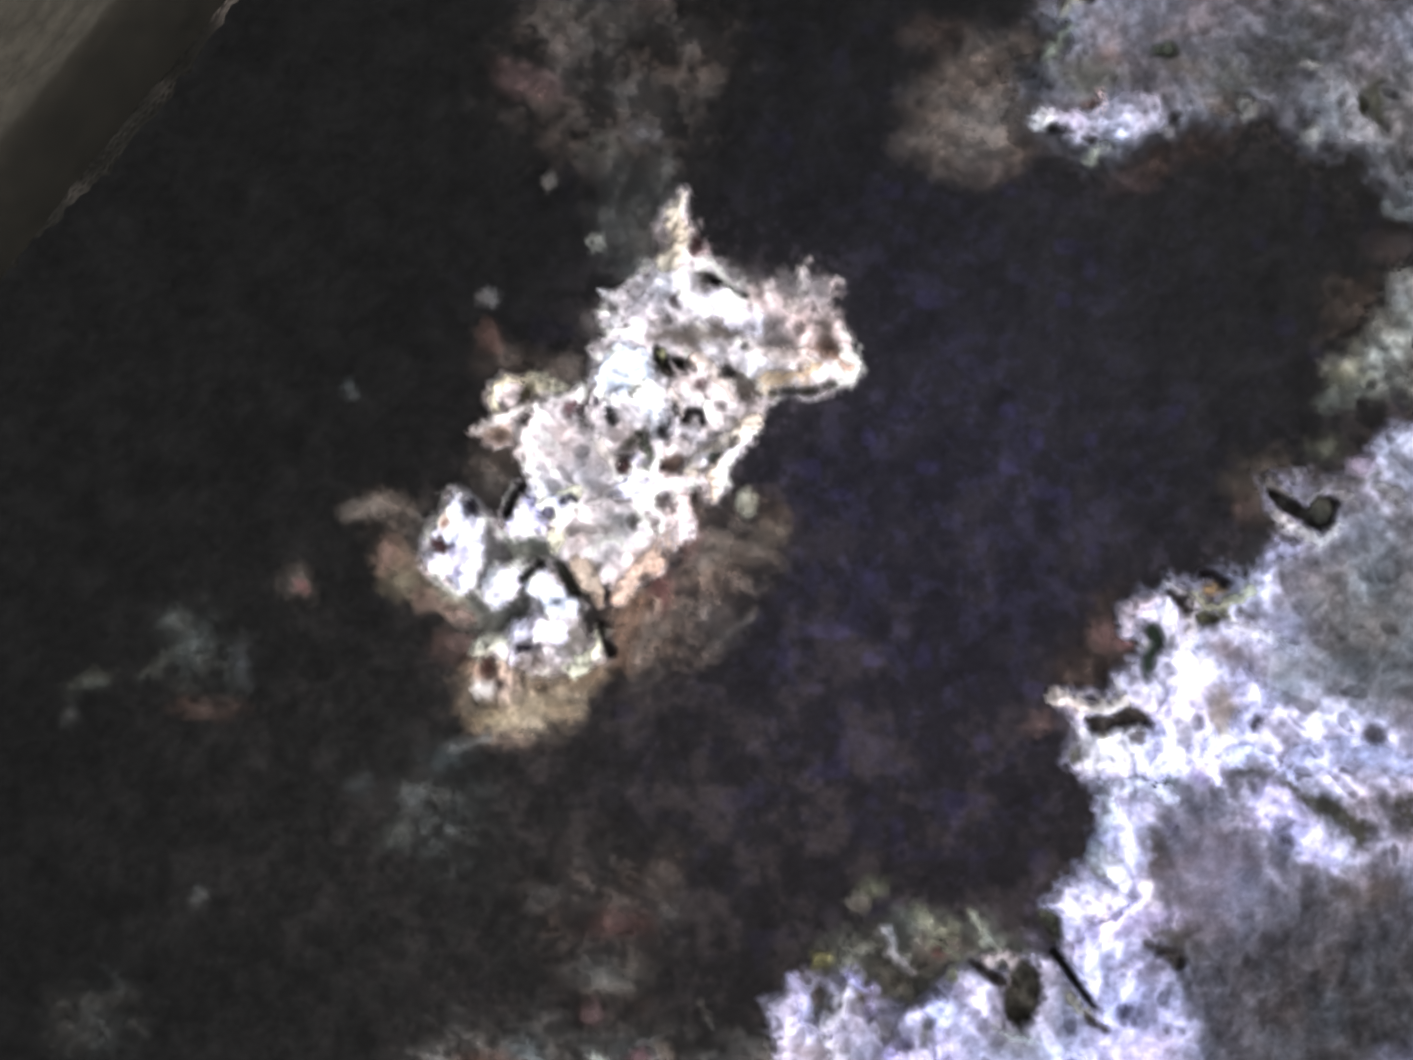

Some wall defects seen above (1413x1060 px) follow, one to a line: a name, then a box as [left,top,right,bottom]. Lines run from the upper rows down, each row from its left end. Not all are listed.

damp [476,287,499,309]